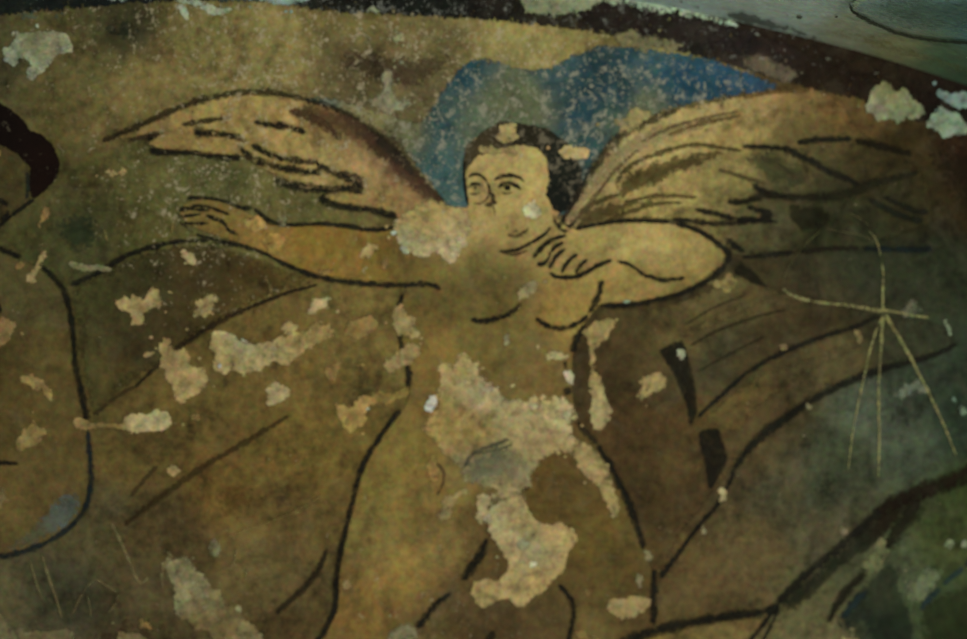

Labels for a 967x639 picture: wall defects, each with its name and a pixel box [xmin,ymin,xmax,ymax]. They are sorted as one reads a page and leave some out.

peeling [2,13,73,81]
peeling [857,81,967,138]
peeling [358,198,472,264]
peeling [0,315,24,347]
peeling [115,287,173,326]
peeling [143,294,423,406]
peeling [73,409,200,434]
peeling [335,387,409,436]
peeling [422,318,621,608]
peeling [160,556,263,639]
peeling [606,573,651,620]
peeling [0,614,75,639]